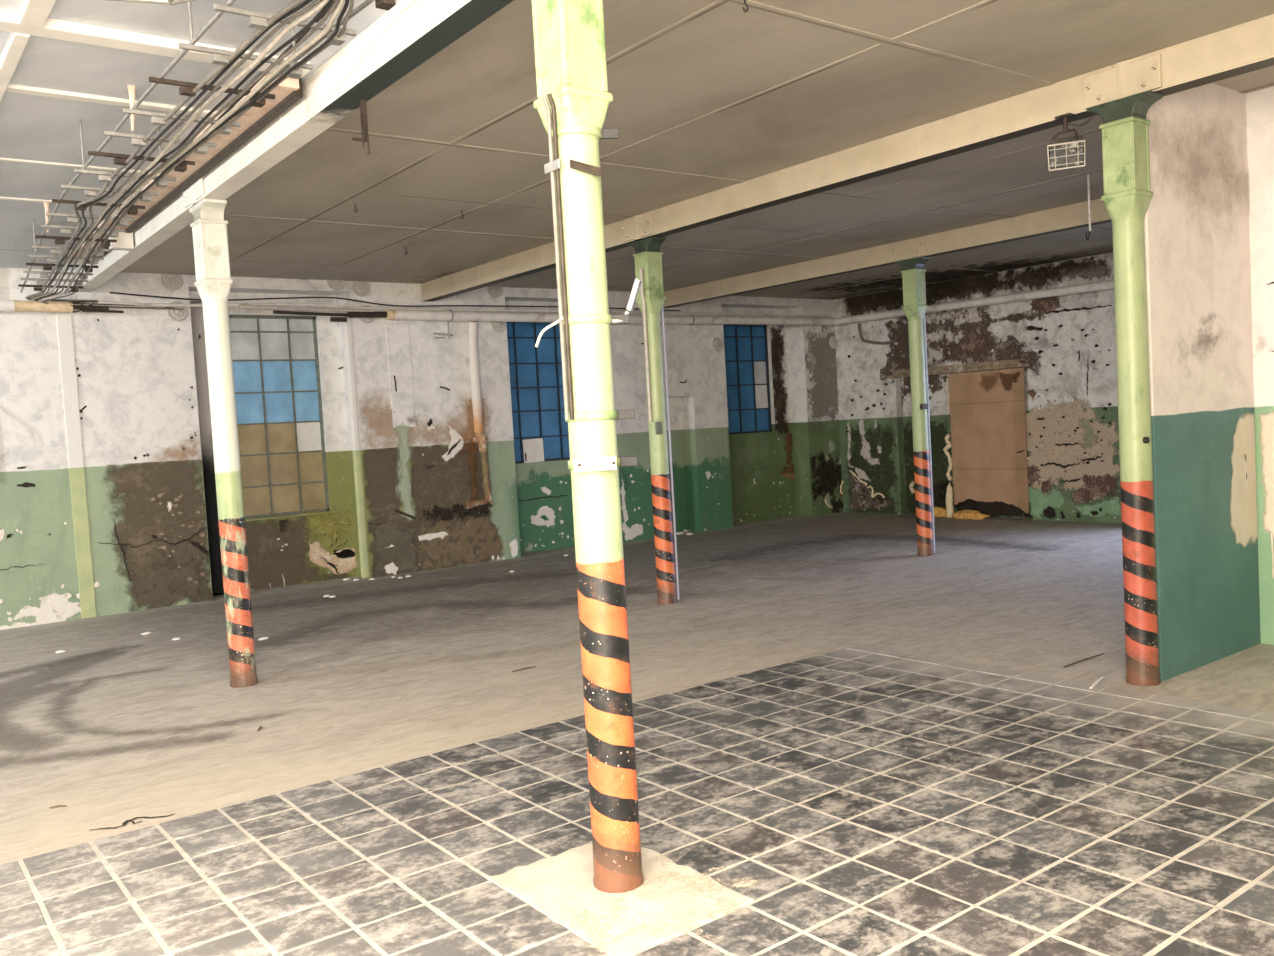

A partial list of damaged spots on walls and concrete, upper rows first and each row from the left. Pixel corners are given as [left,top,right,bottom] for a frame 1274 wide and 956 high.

leakage [923,256,1112,404]
leakage [805,272,916,514]
rust [458,405,485,501]
spalling [840,379,892,513]
leakage [930,421,1025,518]
flaking render [1024,389,1121,519]
spalling [309,522,420,581]
peeling [418,531,448,541]
peeling [0,584,81,630]